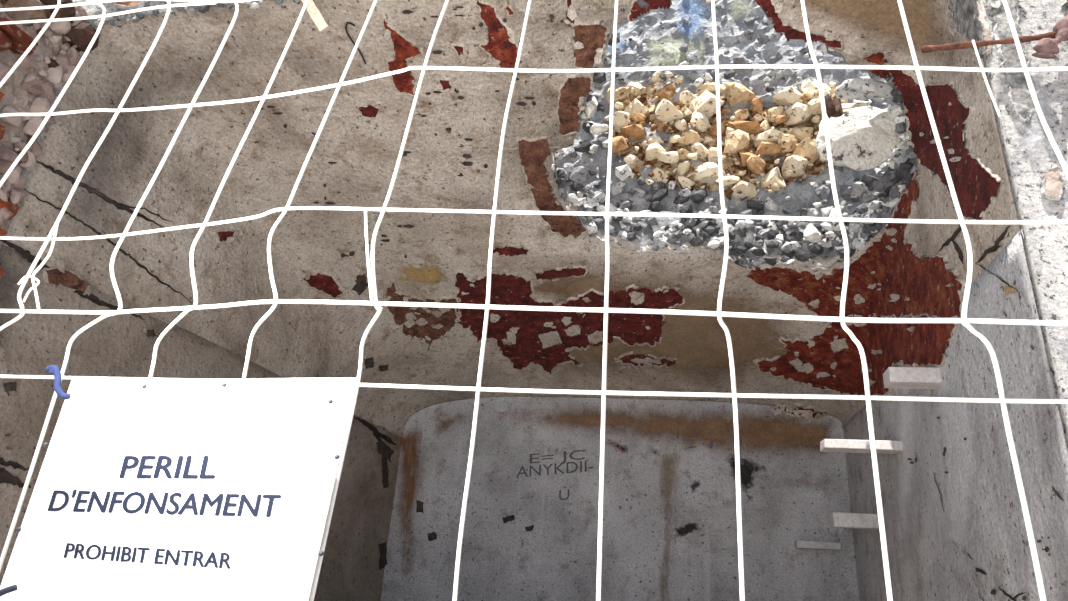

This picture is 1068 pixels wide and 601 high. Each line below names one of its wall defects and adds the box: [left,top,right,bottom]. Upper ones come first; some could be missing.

spalling [84,0,302,27]
peeling [376,0,521,117]
crack [36,160,172,228]
peeling [516,0,1003,396]
crack [0,240,50,271]
crack [24,188,194,304]
crack [73,290,145,320]
peeling [299,270,369,298]
peeling [383,244,685,376]
crack [939,224,1019,293]
rust [545,411,829,450]
rust [400,432,420,531]